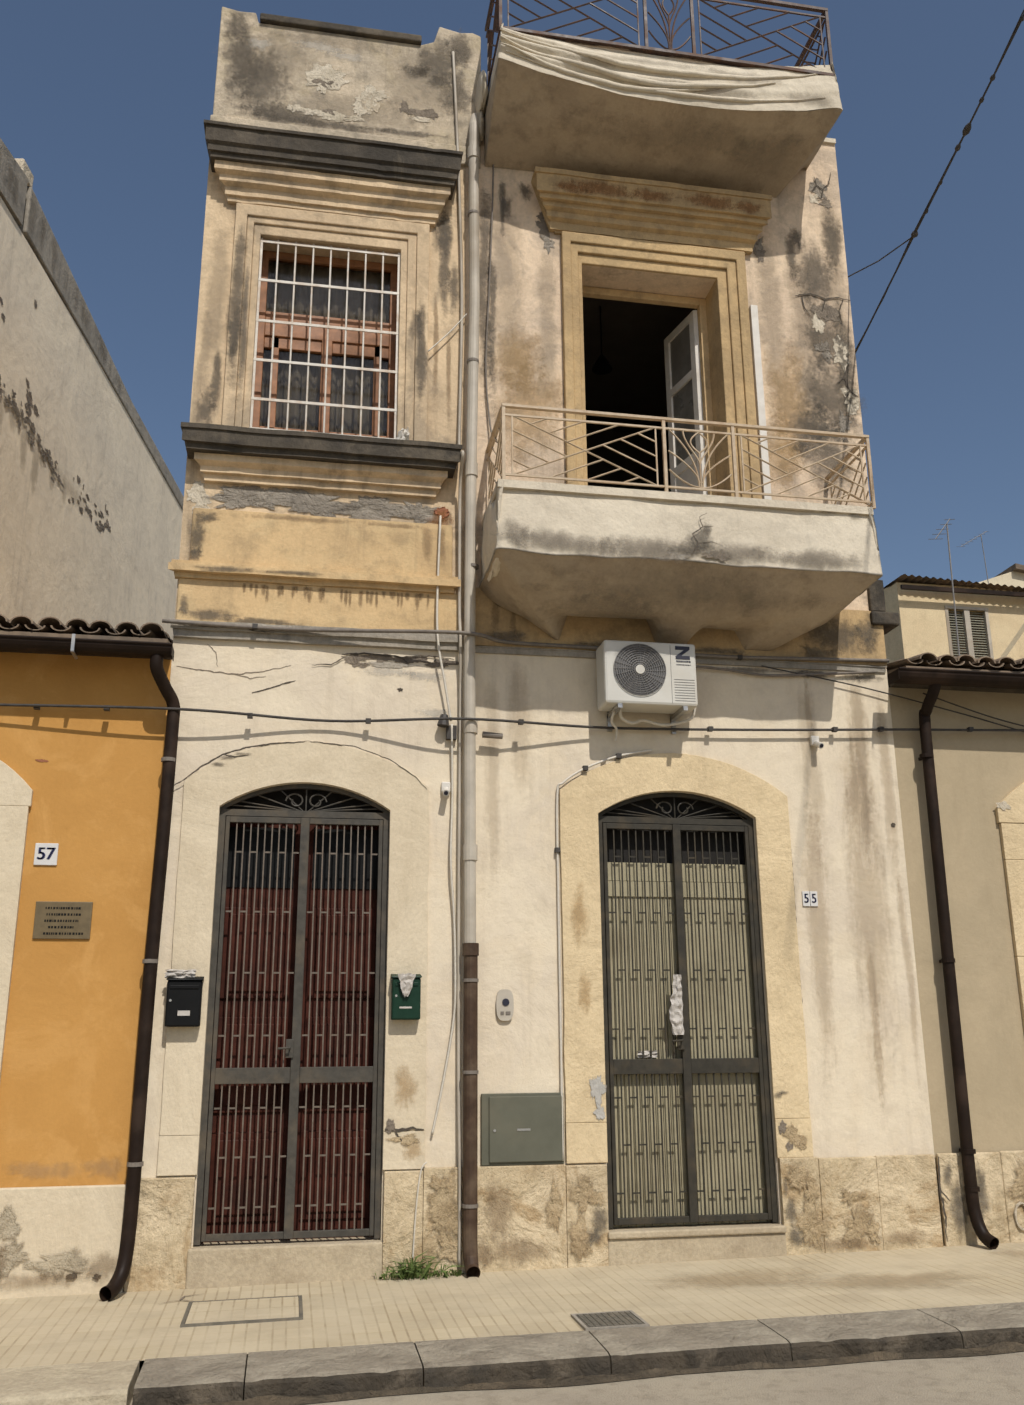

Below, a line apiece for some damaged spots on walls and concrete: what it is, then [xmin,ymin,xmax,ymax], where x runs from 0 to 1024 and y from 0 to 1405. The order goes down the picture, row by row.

water stain [228,15,364,132]
water stain [405,38,470,107]
water stain [382,128,433,136]
water stain [786,221,841,300]
water stain [798,318,853,481]
flaking render [810,305,860,433]
flaking render [0,376,111,532]
flaking render [186,480,450,524]
water stain [507,523,767,563]
water stain [784,550,853,568]
crack [177,626,454,693]
flaking render [342,653,459,668]